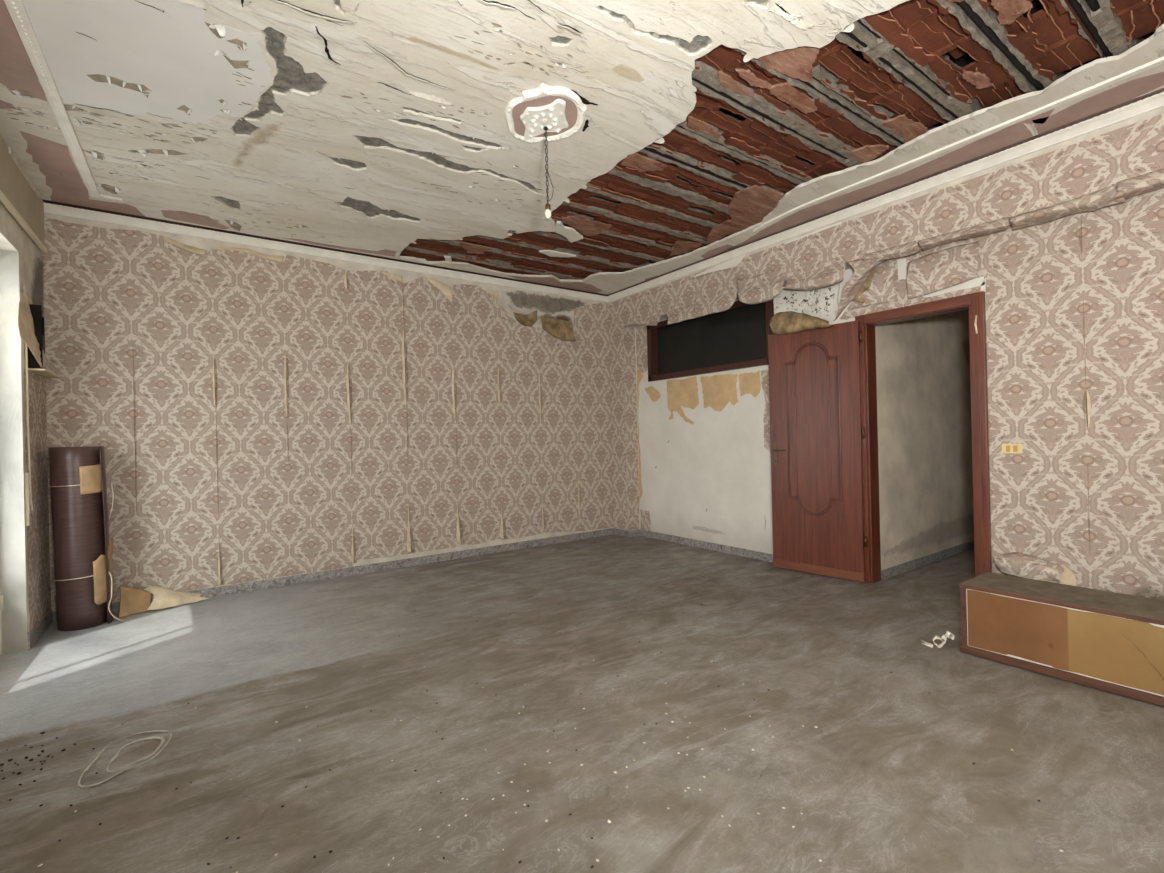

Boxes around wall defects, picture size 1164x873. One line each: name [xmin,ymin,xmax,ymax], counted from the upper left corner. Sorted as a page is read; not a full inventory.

crack [135,0,208,13]
crack [241,0,456,106]
peeling [455,22,575,77]
flaking render [596,5,712,54]
peeling [0,90,60,131]
crack [76,104,171,119]
flaking render [352,105,542,209]